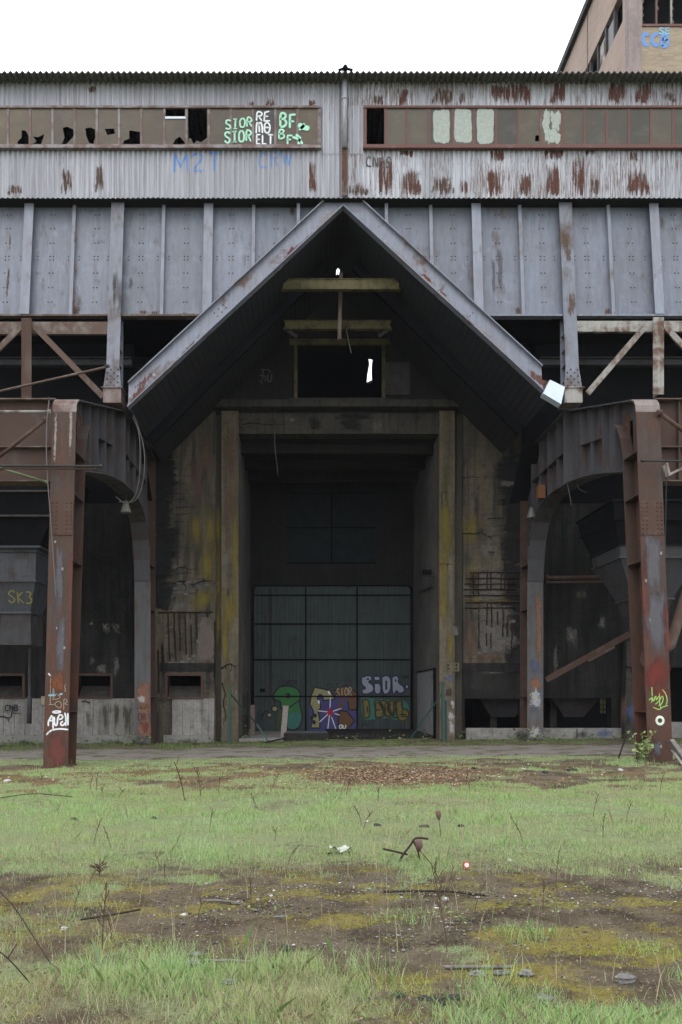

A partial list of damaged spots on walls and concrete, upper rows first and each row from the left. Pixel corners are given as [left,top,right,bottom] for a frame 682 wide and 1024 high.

corrosion [432,88,465,104]
corrosion [491,84,530,104]
corrosion [550,83,566,103]
corrosion [608,81,651,103]
corrosion [342,148,467,210]
corrosion [487,150,504,195]
corrosion [519,173,531,196]
corrosion [544,150,599,195]
corrosion [627,152,650,195]